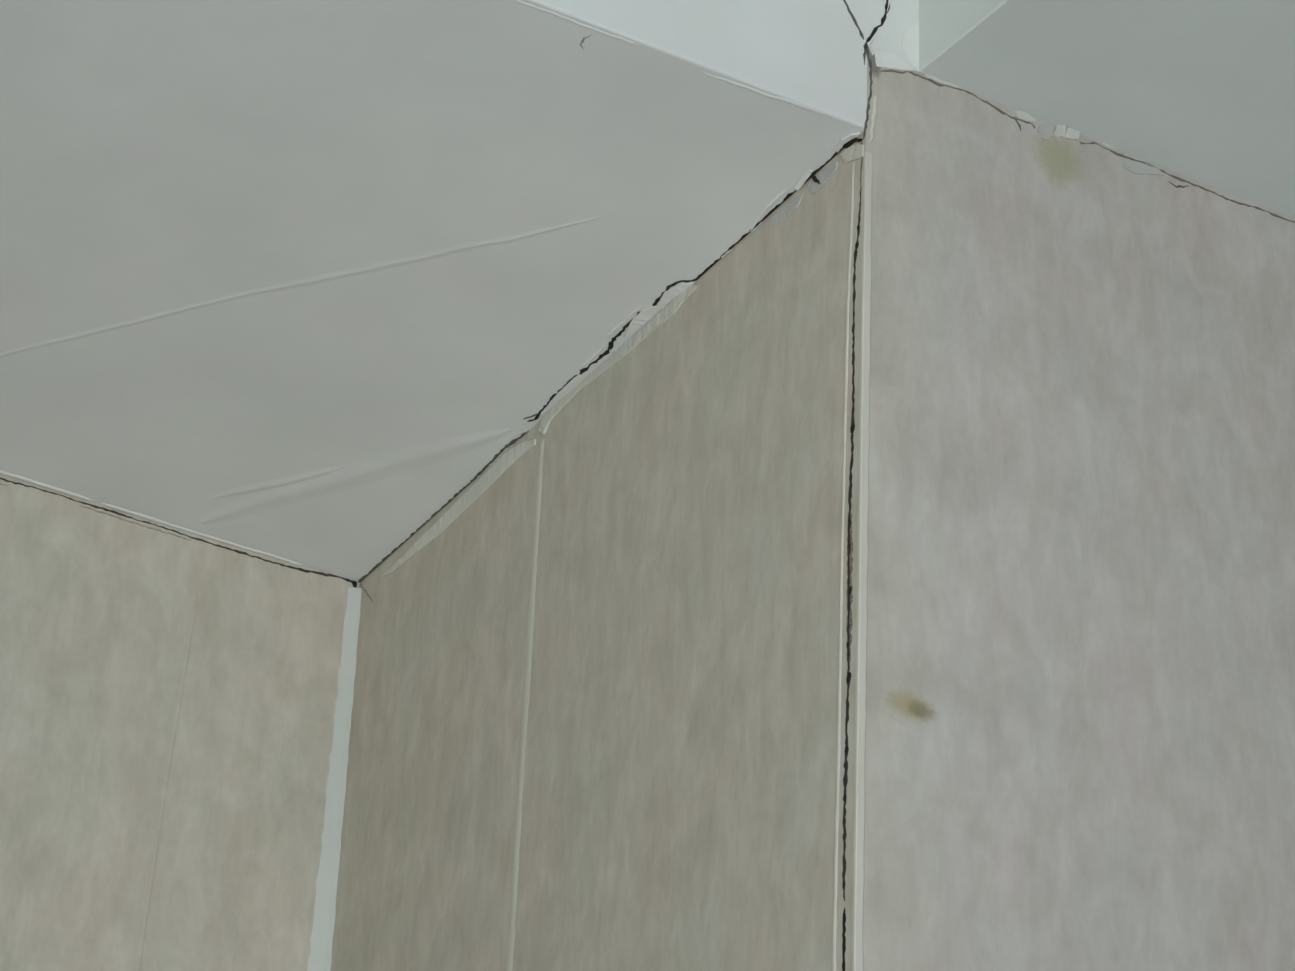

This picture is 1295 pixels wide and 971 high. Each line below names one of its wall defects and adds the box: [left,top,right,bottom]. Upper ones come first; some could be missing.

crack [1080,140,1295,223]
crack [0,0,1036,971]
damp [874,683,946,730]